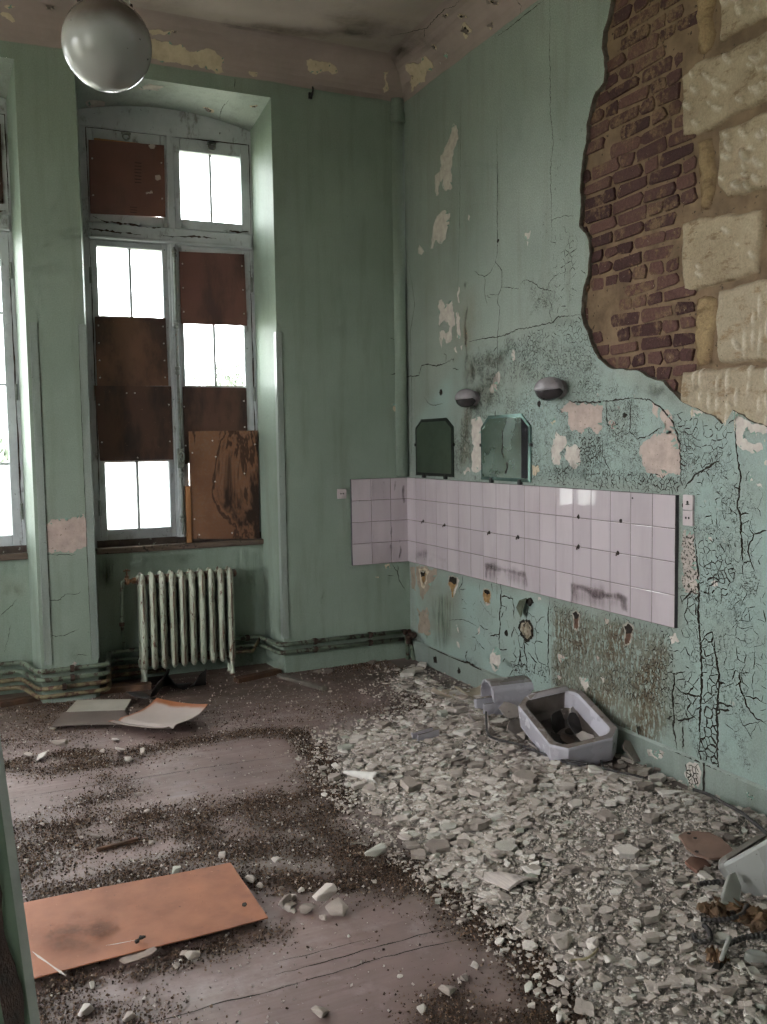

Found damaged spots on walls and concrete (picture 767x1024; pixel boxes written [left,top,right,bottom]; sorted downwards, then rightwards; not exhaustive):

peeling [149,29,224,74]
peeling [405,44,437,92]
peeling [435,124,458,196]
peeling [418,210,450,255]
spalling [579,0,767,465]
peeling [438,287,462,353]
crack [391,1,767,779]
peeling [551,401,627,469]
peeling [639,403,681,478]
peeling [46,514,86,554]
peeling [410,565,459,638]
spalling [482,588,491,606]